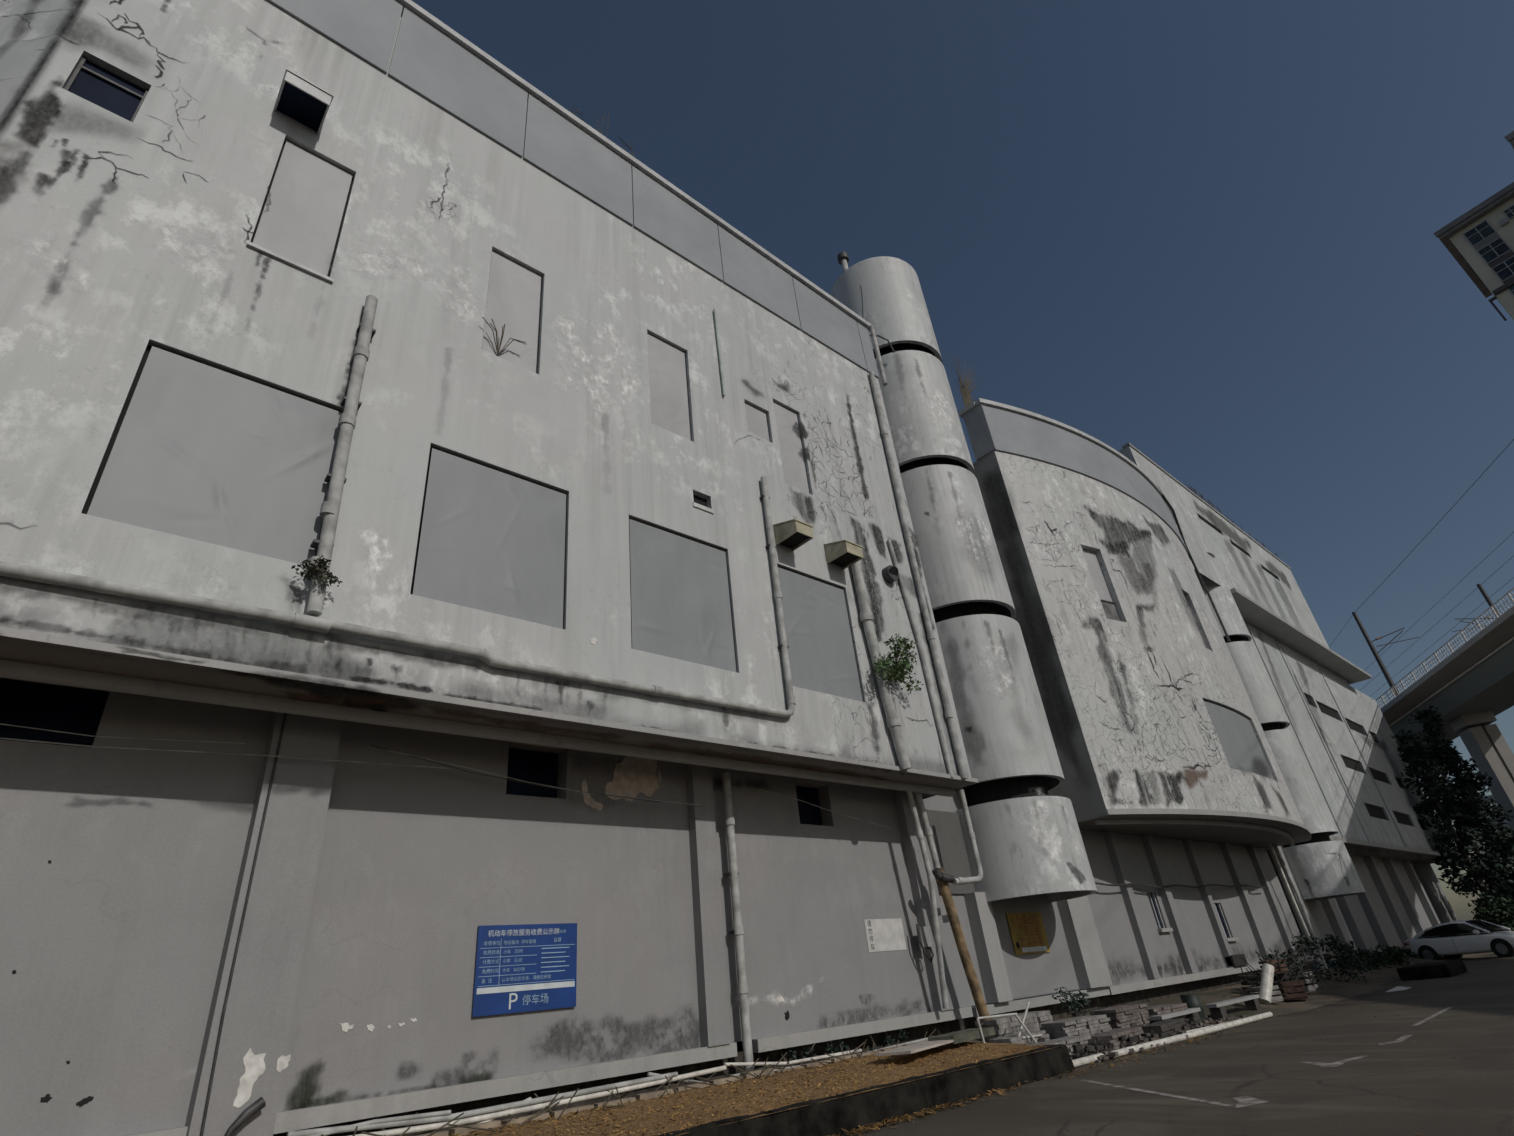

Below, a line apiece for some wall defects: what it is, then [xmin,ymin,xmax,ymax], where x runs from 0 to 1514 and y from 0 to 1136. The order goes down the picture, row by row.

water stain [0,0,83,145]
crack [1,0,210,183]
water stain [37,139,89,186]
water stain [1089,510,1170,588]
water stain [851,518,934,641]
water stain [344,653,535,710]
flaking render [581,756,662,811]
water stain [1108,770,1183,804]
peeling [341,1018,417,1033]
water stain [543,1012,700,1062]
peeling [233,1048,291,1109]
mould [289,1067,342,1110]